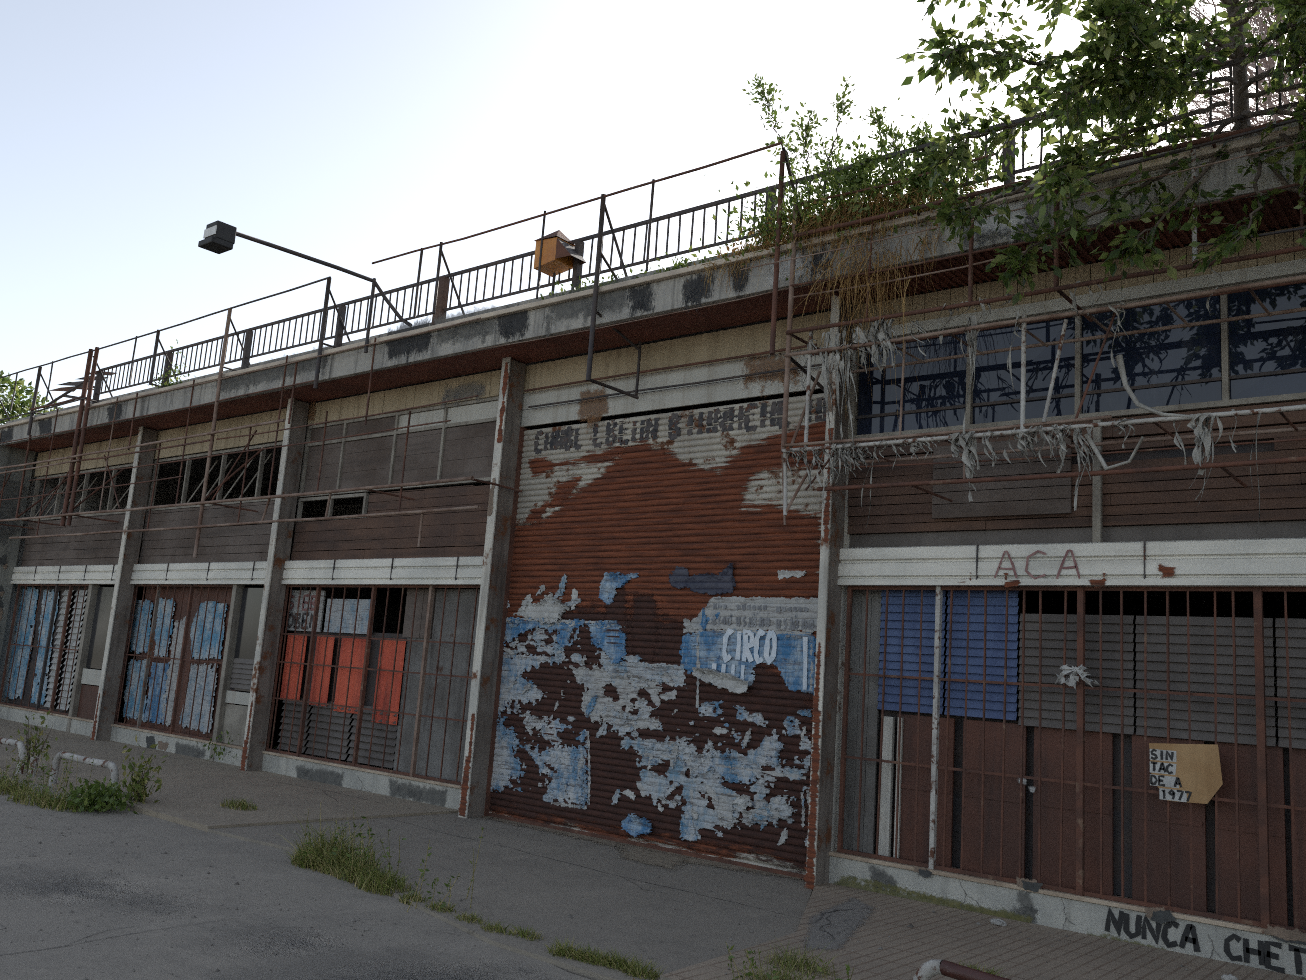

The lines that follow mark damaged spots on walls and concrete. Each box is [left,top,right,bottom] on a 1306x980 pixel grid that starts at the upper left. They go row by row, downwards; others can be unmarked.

corrosion [578,387,608,432]
corrosion [504,421,826,648]
corrosion [489,630,821,890]